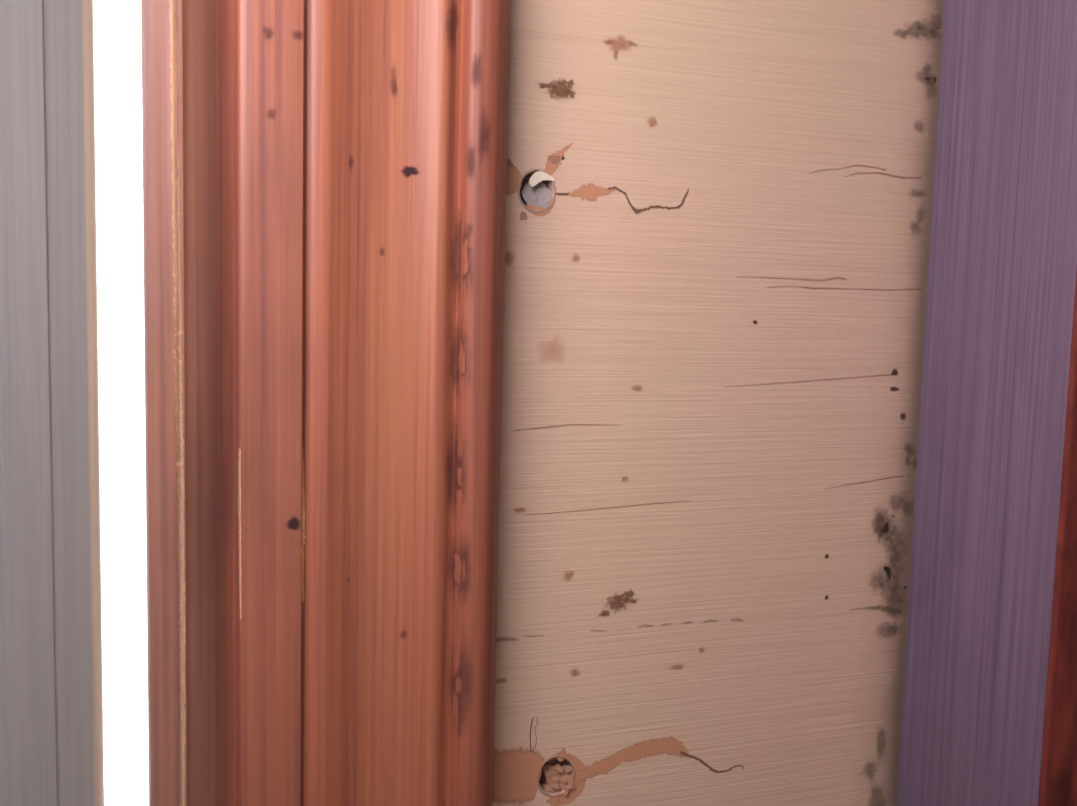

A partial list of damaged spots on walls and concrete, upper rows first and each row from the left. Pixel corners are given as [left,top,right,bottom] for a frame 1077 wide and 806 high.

peeling [506,143,573,194]
peeling [520,197,556,220]
crack [556,184,689,214]
spalling [493,748,587,806]
crack [570,736,744,784]